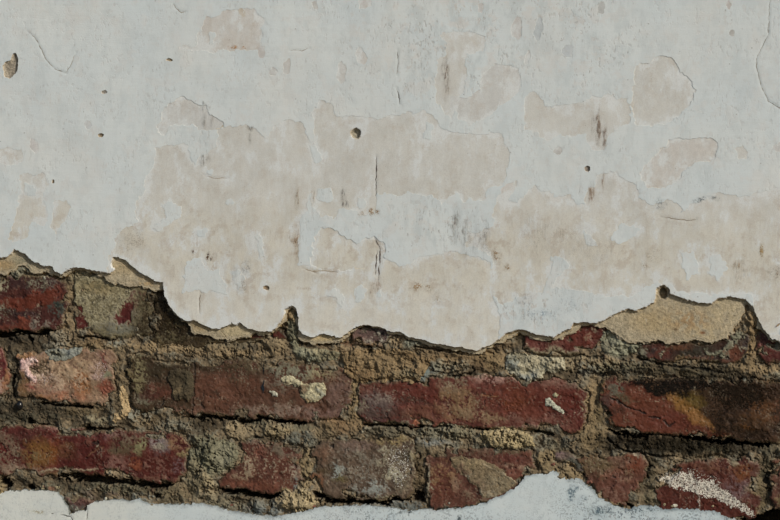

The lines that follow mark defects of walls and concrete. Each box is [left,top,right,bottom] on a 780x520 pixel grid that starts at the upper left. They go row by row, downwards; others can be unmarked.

peeling [180,8,265,58]
crack [756,3,780,108]
peeling [0,31,780,384]
spalling [113,385,132,424]
spalling [281,375,326,403]
spalling [545,393,564,414]
spalling [198,439,239,475]
spalling [450,455,517,498]
spalling [480,426,535,449]
spalling [281,488,319,512]